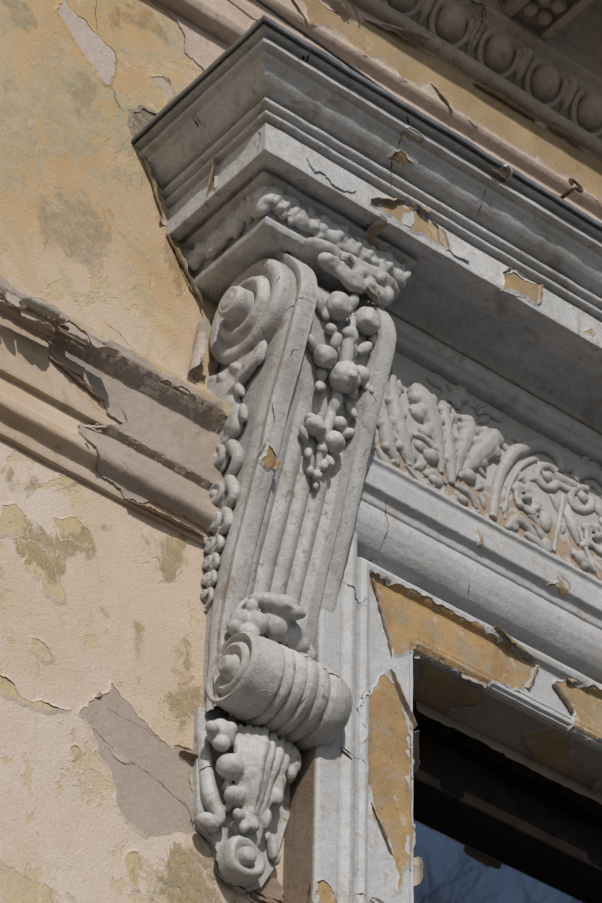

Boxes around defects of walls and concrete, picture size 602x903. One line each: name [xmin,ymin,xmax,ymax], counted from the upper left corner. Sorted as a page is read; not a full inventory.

peeling [53,0,119,90]
peeling [293,0,602,209]
peeling [365,197,450,251]
peeling [500,267,544,307]
peeling [0,275,226,537]
peeling [0,501,68,606]
peeling [50,514,96,550]
peeling [0,673,198,840]
peeling [356,559,602,896]
peeling [121,848,142,893]
peeling [312,877,338,903]